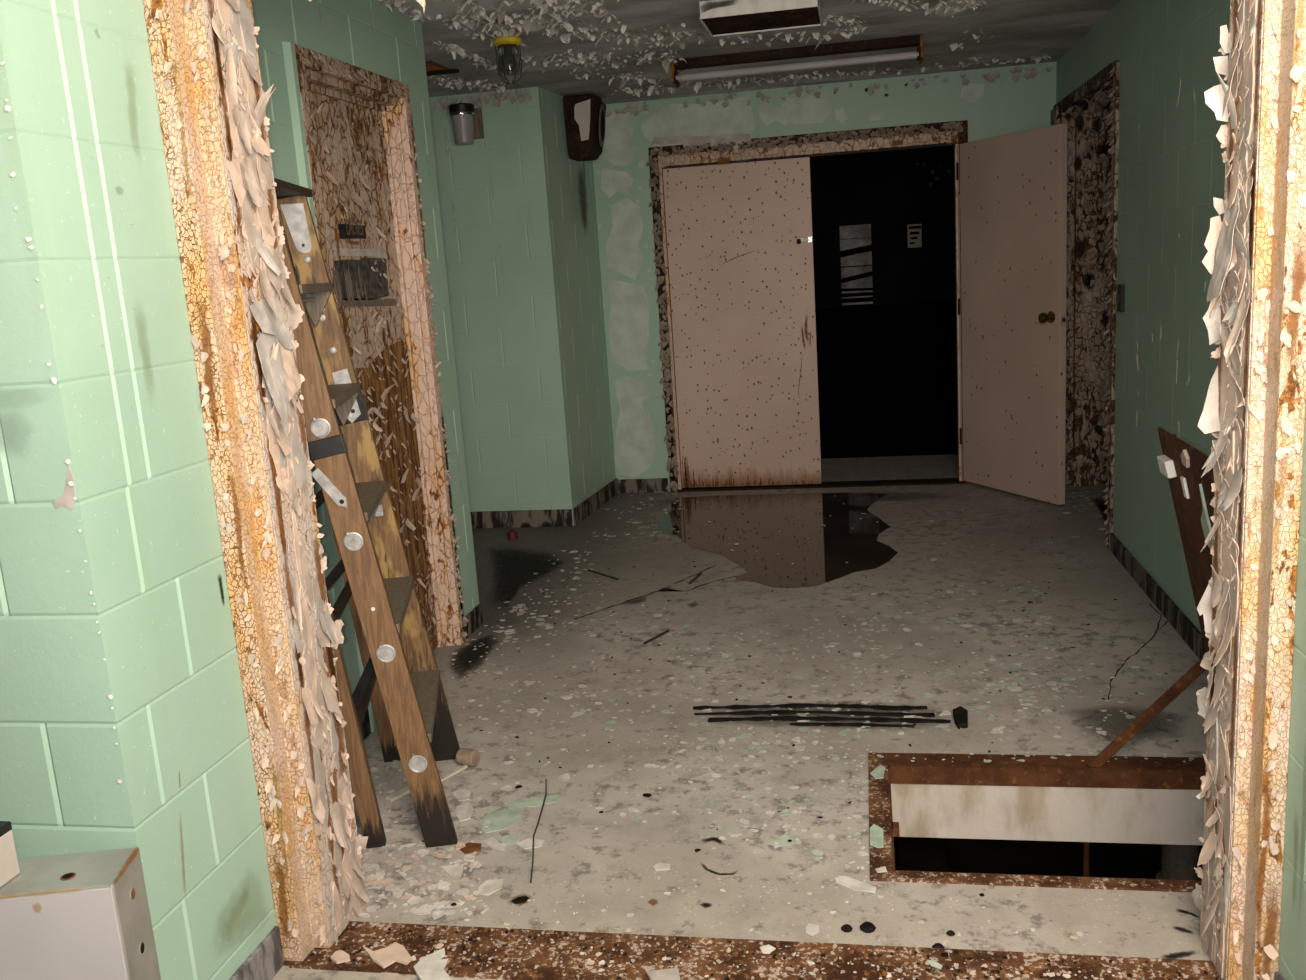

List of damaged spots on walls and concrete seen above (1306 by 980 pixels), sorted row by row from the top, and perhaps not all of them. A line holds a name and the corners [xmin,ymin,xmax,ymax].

peeling [379,0,1052,478]
peeling [300,47,468,639]
peeling [191,0,370,964]
spalling [835,0,1306,980]
crack [1108,604,1168,700]
peeling [452,788,474,822]
peeling [482,835,545,850]
peeling [478,879,504,896]
peeling [363,942,453,980]
peeling [646,968,680,980]
peeling [760,944,776,954]
peeling [805,924,819,936]